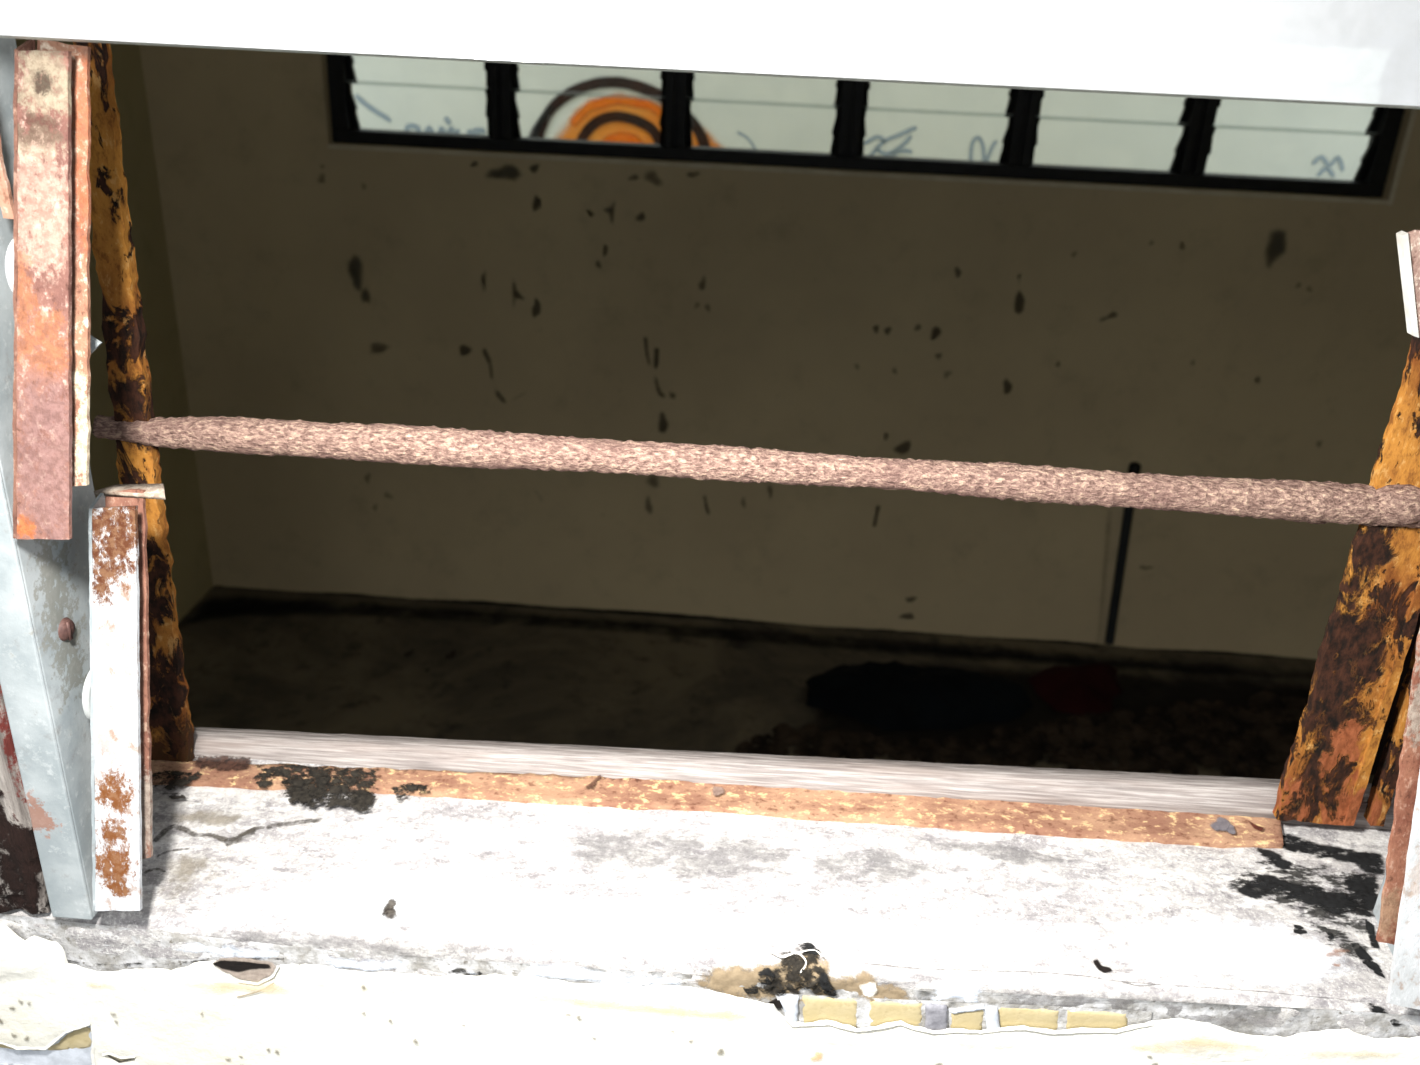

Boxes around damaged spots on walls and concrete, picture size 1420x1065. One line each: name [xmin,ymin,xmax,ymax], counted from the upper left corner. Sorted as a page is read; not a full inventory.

crack [145,818,319,873]
corrosion [1210,817,1263,834]
damp [1119,834,1385,986]
spalling [213,957,280,986]
peeling [698,942,1154,1035]
peeling [0,1023,136,1065]